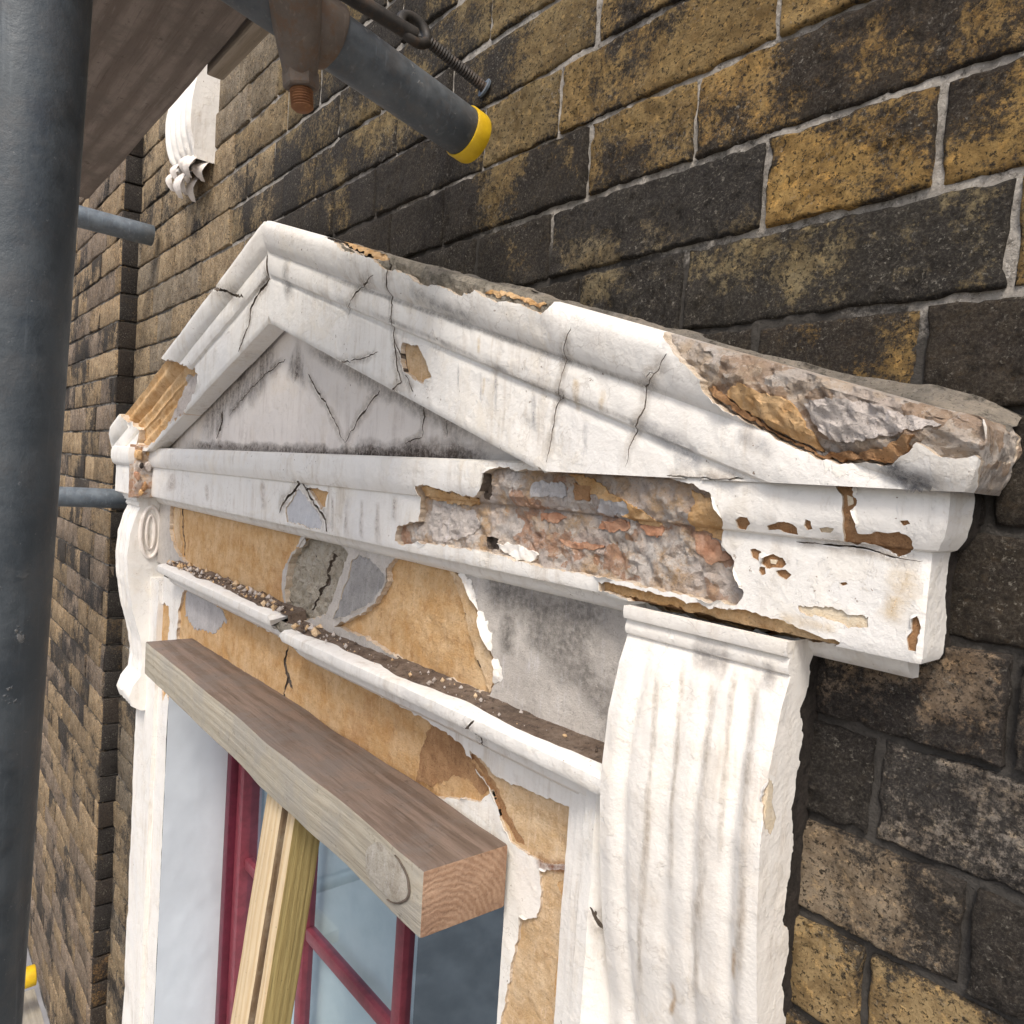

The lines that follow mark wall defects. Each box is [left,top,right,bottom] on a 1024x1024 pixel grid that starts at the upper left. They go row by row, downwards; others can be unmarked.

spalling [118,358,202,498]
crack [214,255,270,352]
crack [308,261,447,445]
spalling [401,343,431,386]
crack [546,329,571,462]
crack [626,353,667,464]
spalling [663,332,1022,657]
crack [283,649,293,696]
spalling [162,487,569,1024]
spalling [395,466,840,1017]